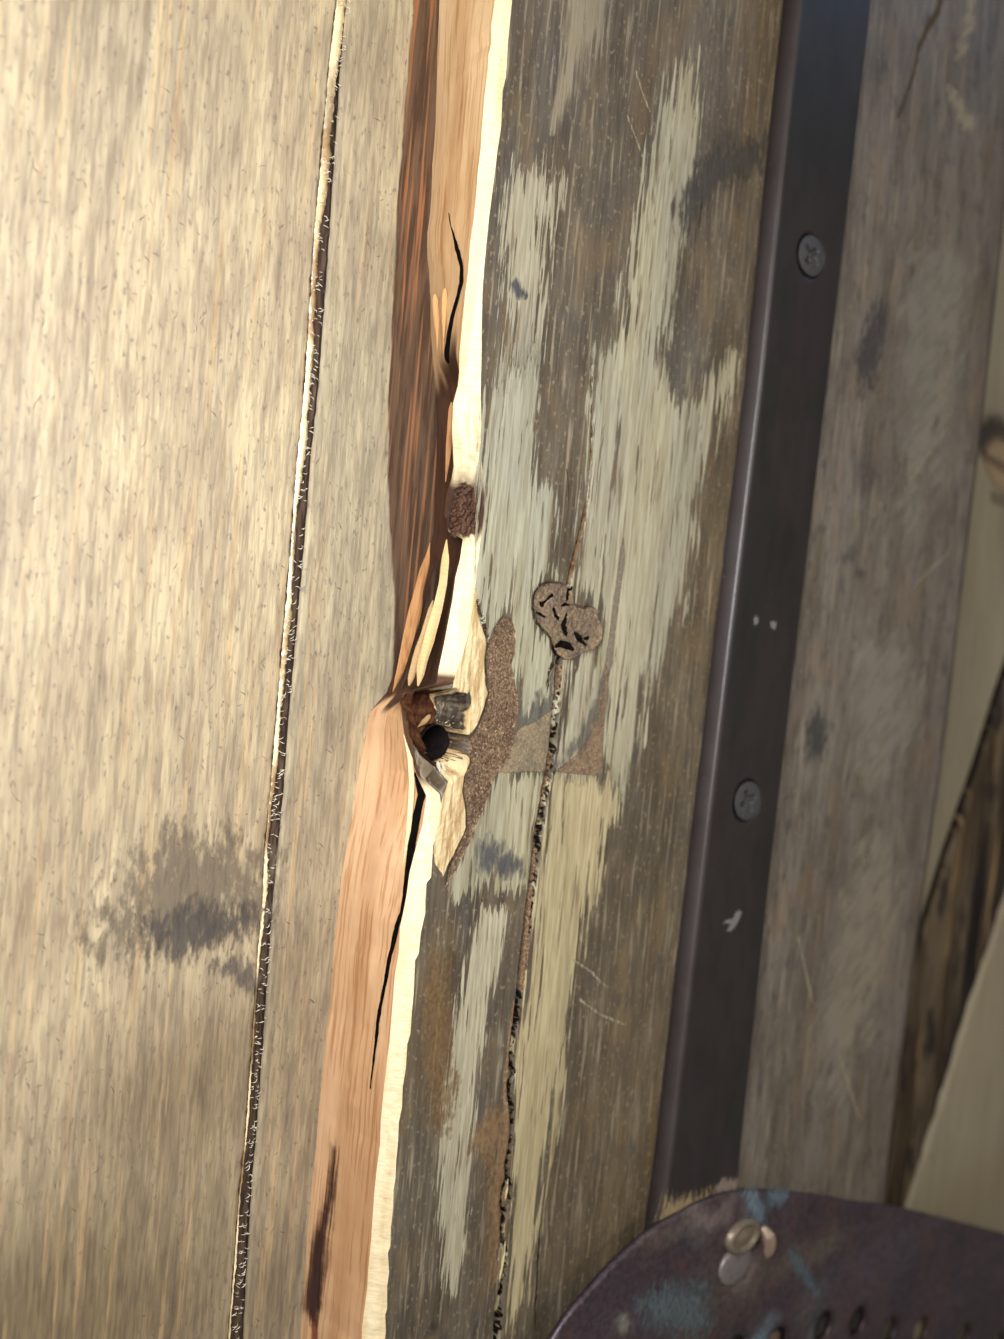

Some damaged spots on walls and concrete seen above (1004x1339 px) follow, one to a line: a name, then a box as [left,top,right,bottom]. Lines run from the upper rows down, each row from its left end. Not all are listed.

peeling [429,590,488,735]
peeling [432,748,470,876]
damp [81,815,288,992]
crack [492,662,562,1339]